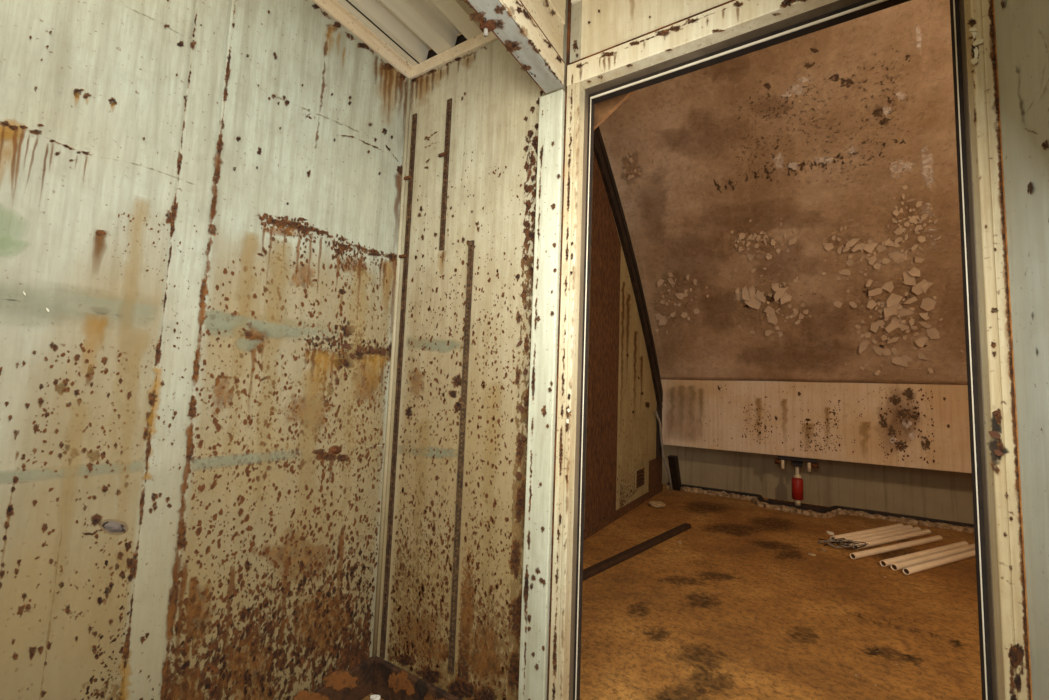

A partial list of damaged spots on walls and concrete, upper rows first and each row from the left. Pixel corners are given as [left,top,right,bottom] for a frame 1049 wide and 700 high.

rust [0,121,92,179]
rust [312,4,486,115]
water stain [738,48,885,182]
water stain [829,28,921,140]
rust [163,194,178,311]
rust [192,118,236,382]
rust [257,202,397,407]
rust [388,0,743,700]
peeling [735,276,811,337]
peeling [822,160,943,464]
rust [0,401,37,588]
rust [74,327,382,700]